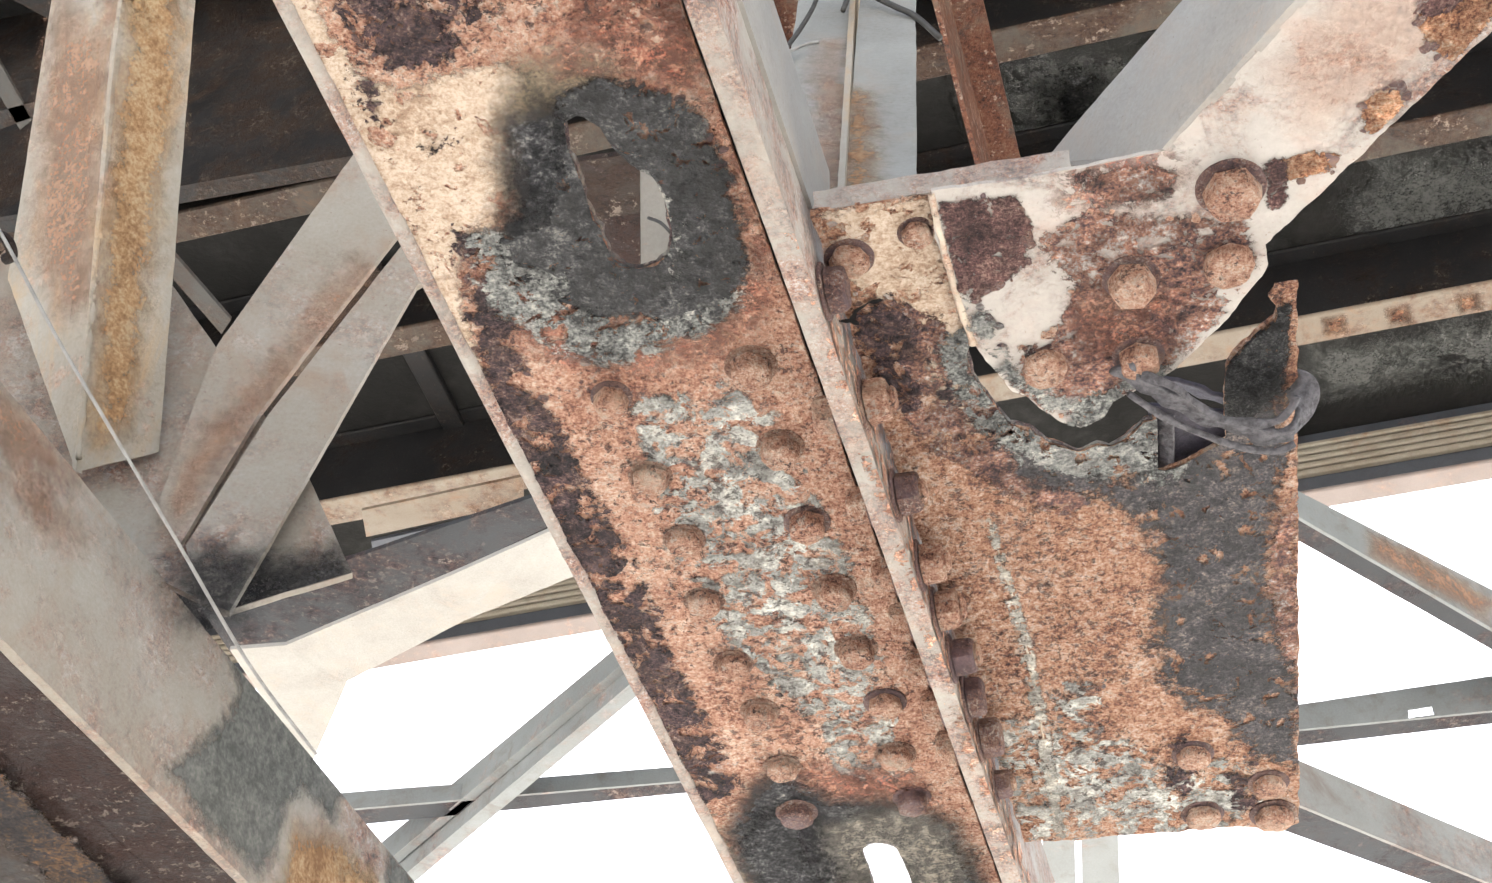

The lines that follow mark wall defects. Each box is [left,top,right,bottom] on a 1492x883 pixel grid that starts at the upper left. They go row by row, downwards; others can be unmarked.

peeling [539,0,686,102]
rust [553,0,697,85]
rust [1412,0,1492,62]
rust [1356,80,1412,134]
rust [40,0,184,443]
peeling [291,0,527,387]
rust [466,138,770,375]
peeling [639,166,683,276]
rust [1009,153,1265,418]
rust [1263,150,1341,211]
rust [794,271,1031,883]
peeling [721,836,748,883]